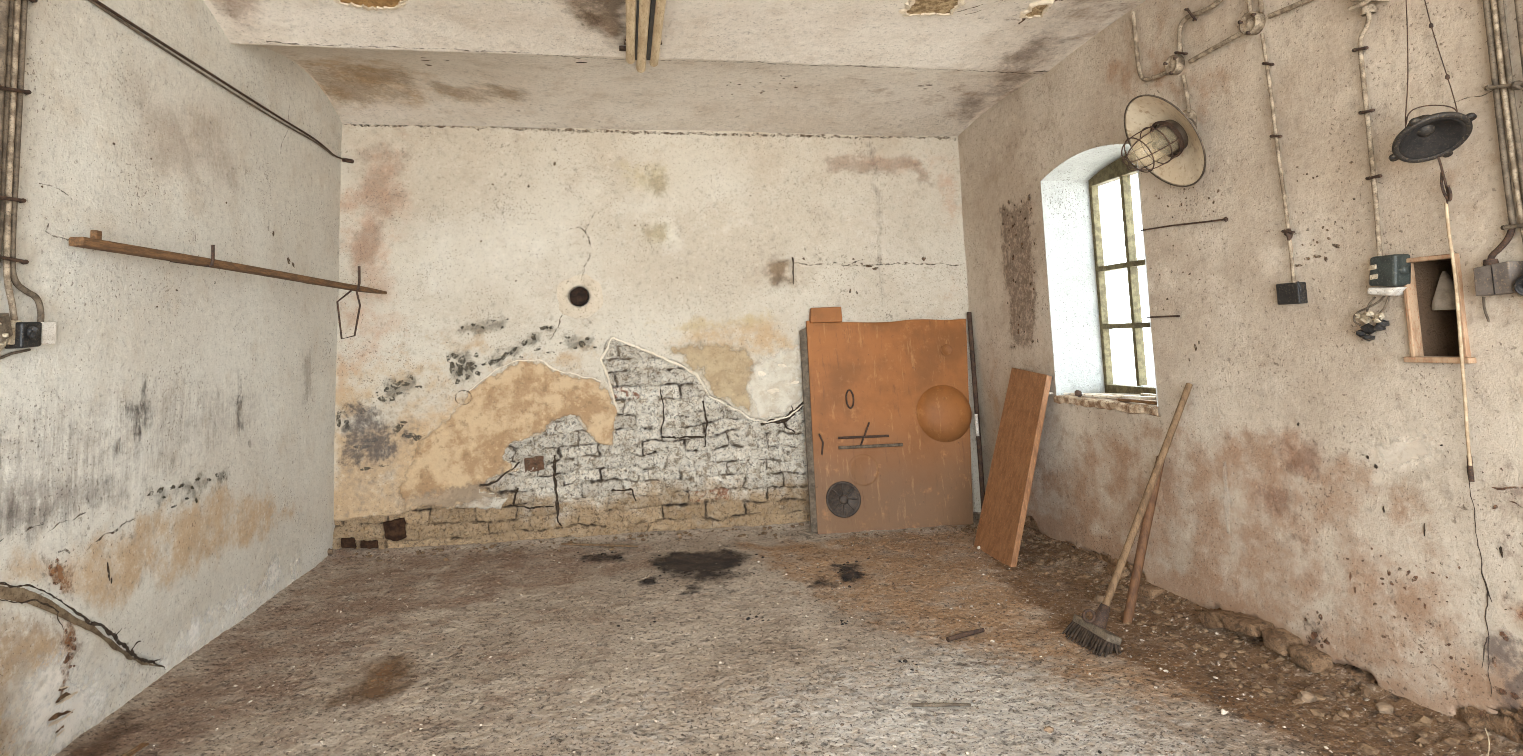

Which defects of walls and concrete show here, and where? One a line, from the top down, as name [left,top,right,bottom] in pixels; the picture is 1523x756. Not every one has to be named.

spalling [898,0,983,17]
water stain [336,375,422,471]
spalling [332,337,810,550]
water stain [147,473,225,508]
crack [1467,469,1492,694]
crack [0,582,165,668]
water stain [1486,631,1523,710]